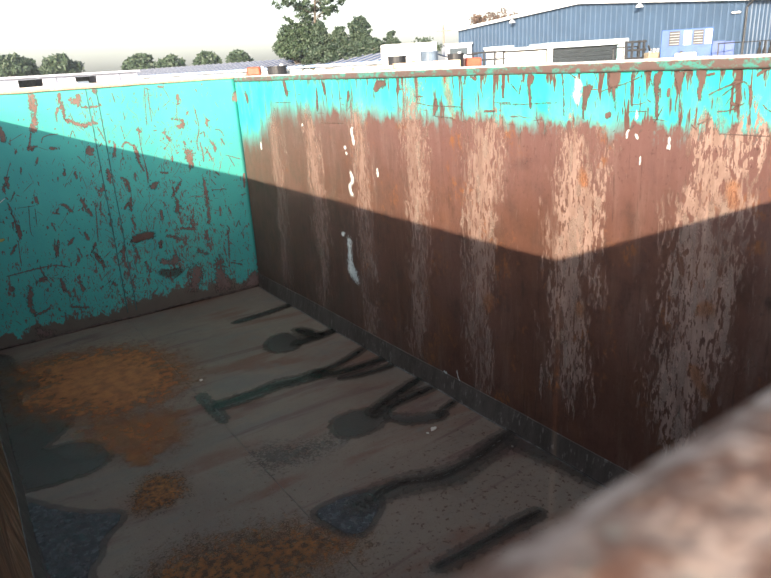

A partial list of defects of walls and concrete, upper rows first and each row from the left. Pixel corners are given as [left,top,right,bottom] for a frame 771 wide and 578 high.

peeling [572,76,583,106]
corrosion [731,80,753,125]
spalling [130,231,155,243]
spalling [159,268,182,277]
damp [267,328,335,352]
damp [333,377,455,437]
damp [349,429,602,514]